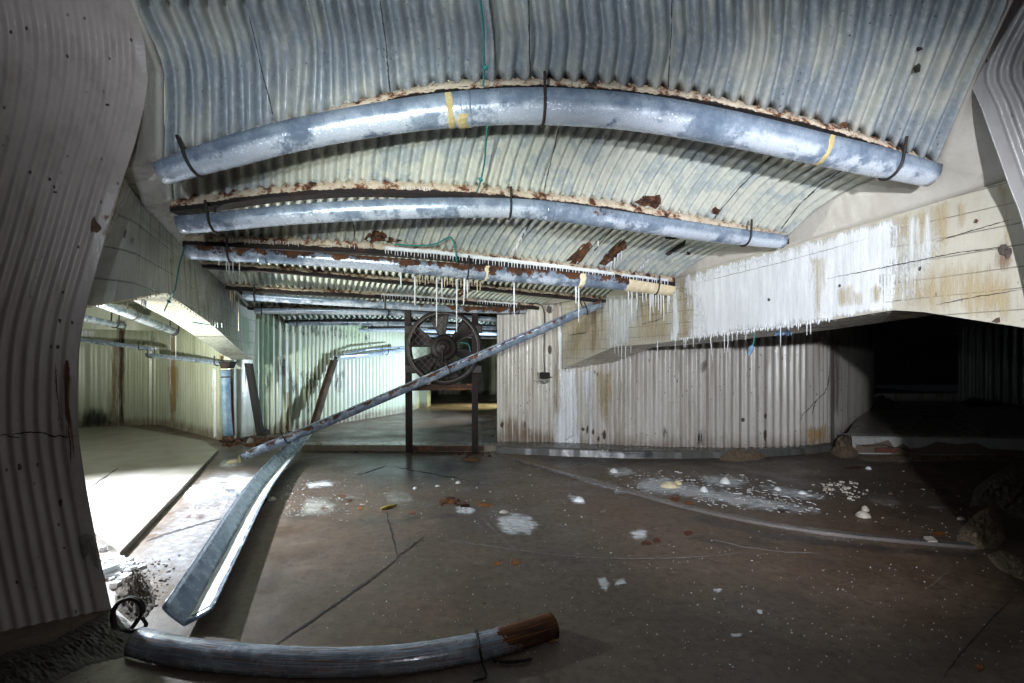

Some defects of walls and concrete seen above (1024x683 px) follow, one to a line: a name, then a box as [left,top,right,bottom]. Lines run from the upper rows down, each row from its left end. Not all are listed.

corrosion [635,194,661,209]
corrosion [566,242,593,264]
corrosion [599,240,627,266]
crack [1,364,75,438]
corrosion [64,360,74,460]
damp [83,340,117,426]
damp [169,335,178,414]
damp [212,354,223,439]
damp [381,206,1008,463]
crack [276,511,824,644]